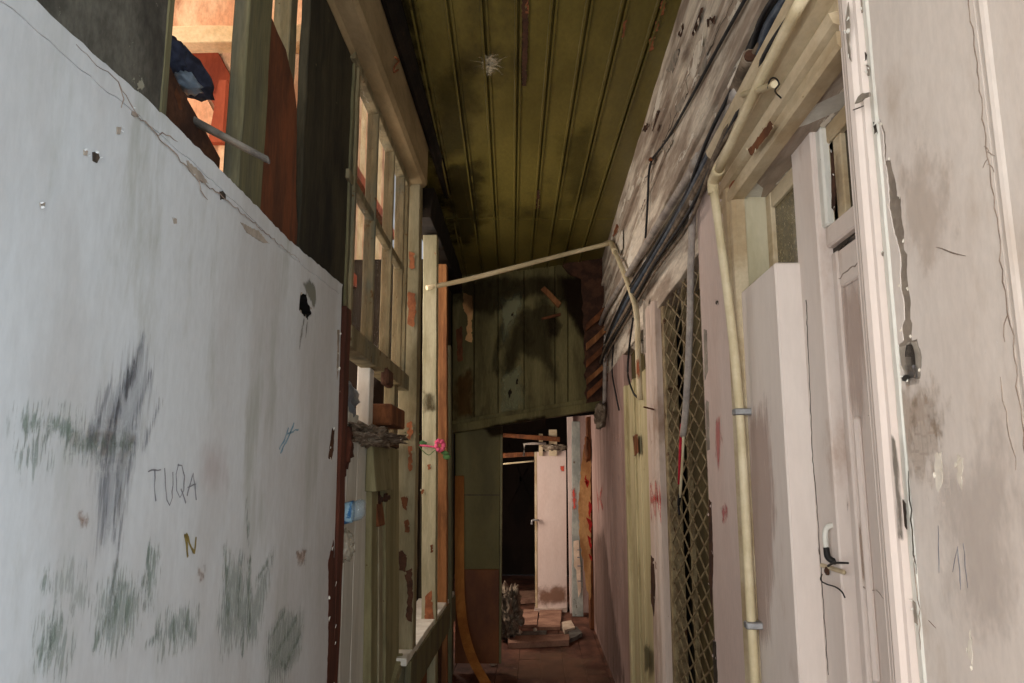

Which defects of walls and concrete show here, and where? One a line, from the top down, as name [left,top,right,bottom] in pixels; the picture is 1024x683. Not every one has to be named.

crack [76,44,300,262]
crack [968,0,1024,470]
spalling [299,292,312,320]
water stain [501,294,521,341]
water stain [501,368,521,411]